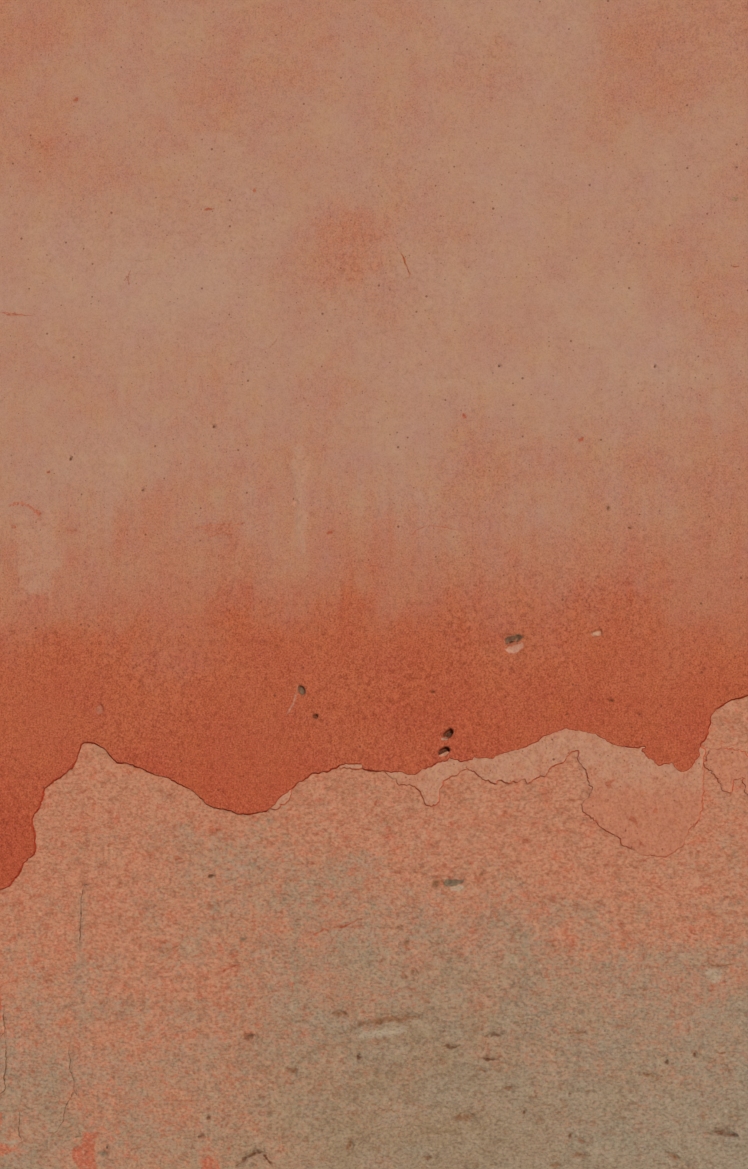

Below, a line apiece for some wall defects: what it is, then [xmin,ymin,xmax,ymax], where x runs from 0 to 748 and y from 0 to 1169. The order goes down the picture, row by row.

spalling [0,695,748,1169]